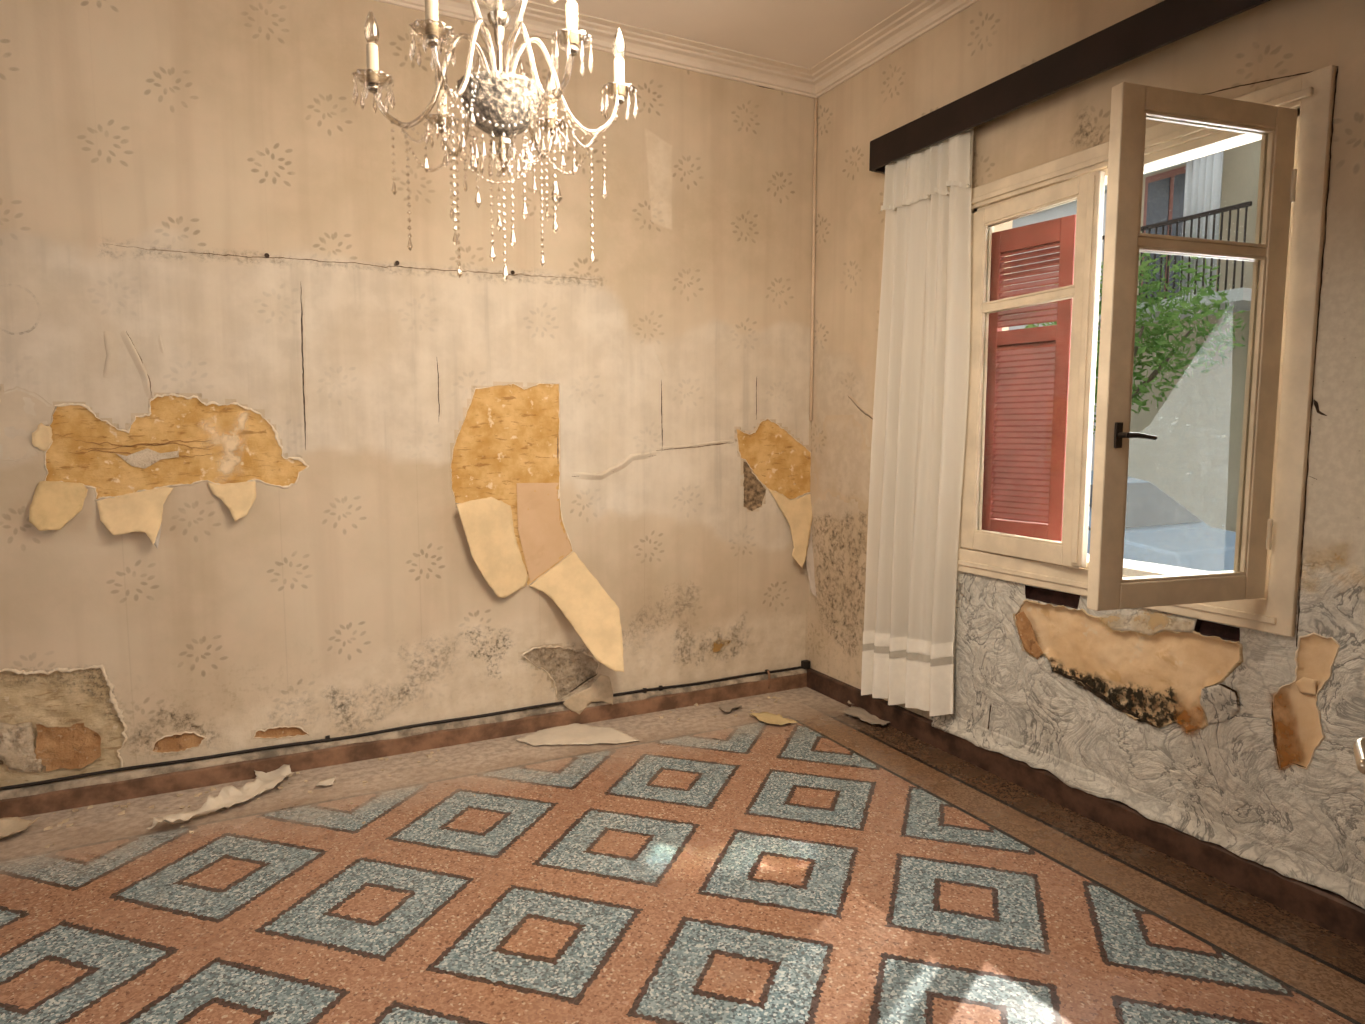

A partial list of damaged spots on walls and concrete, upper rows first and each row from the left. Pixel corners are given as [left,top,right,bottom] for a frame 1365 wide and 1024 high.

crack [301,289,309,450]
damp [0,218,876,652]
flaking render [743,461,766,511]
flaking render [0,664,128,787]
damp [136,600,806,765]
flaking render [521,645,613,715]
flaking render [1013,599,1243,735]